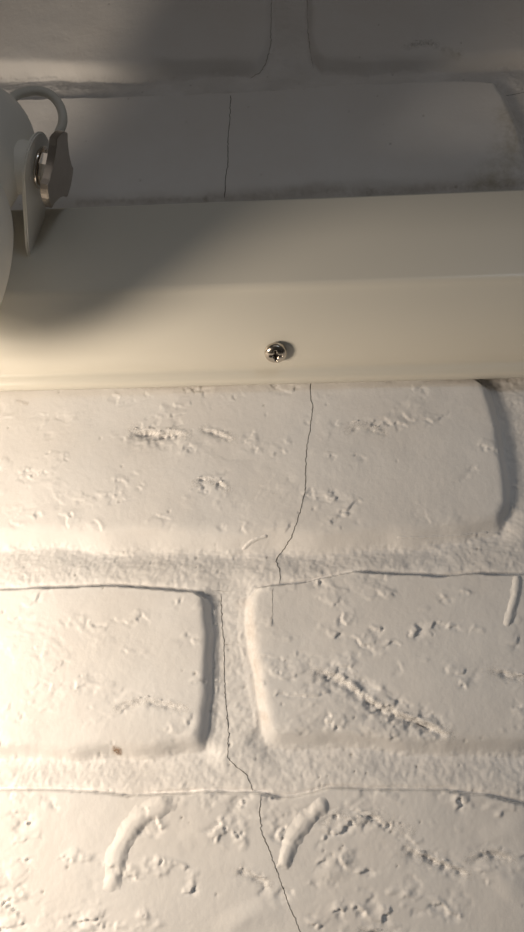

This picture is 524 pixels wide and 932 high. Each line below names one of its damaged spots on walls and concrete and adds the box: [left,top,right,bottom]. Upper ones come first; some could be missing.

crack [223,95,231,198]
crack [271,384,313,626]
crack [218,590,300,931]